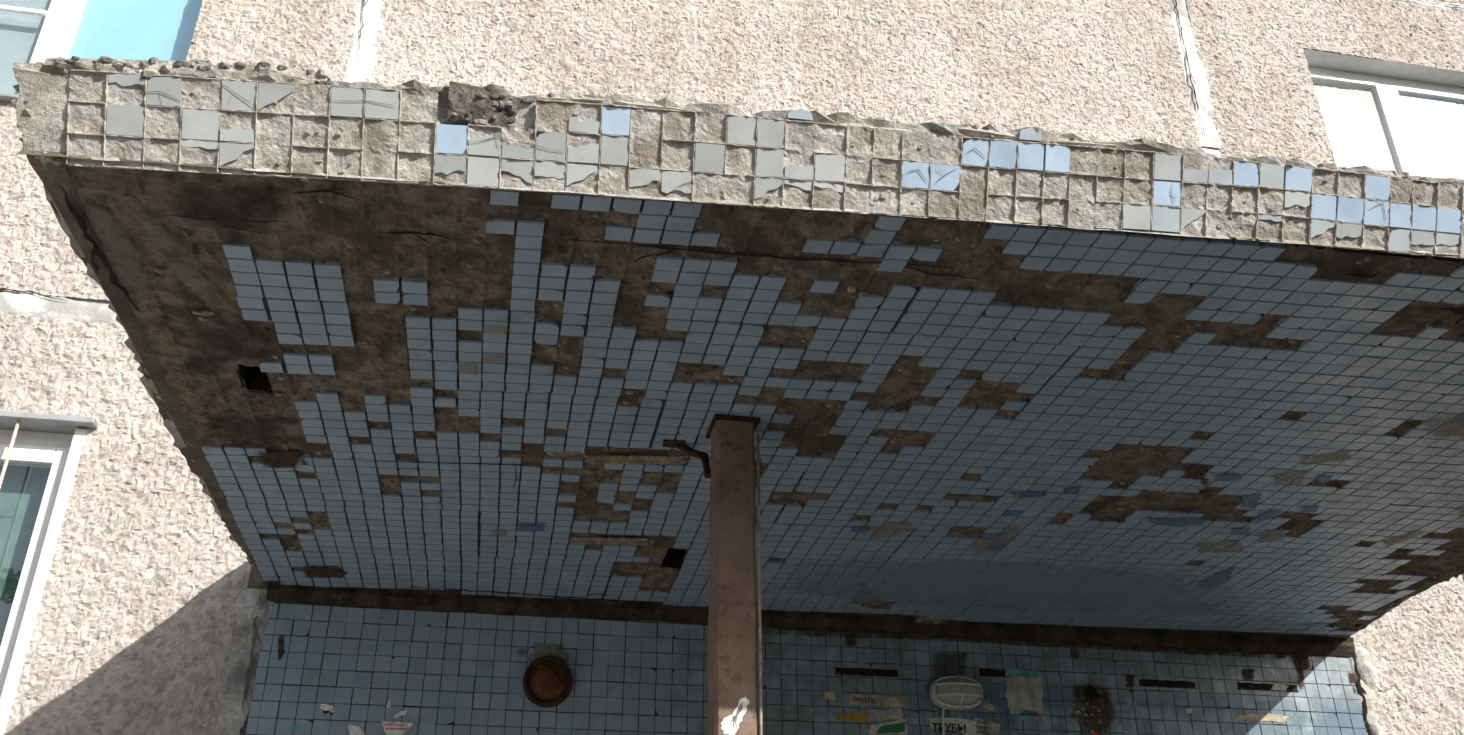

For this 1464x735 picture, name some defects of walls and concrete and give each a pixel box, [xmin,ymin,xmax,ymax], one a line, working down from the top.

spalling [1179,154,1464,283]
spalling [11,56,1306,626]
spalling [1370,299,1464,340]
spalling [1388,418,1423,435]
spalling [1309,478,1350,486]
spalling [1276,511,1324,536]
peeling [757,527,1464,657]
spalling [1072,671,1116,735]